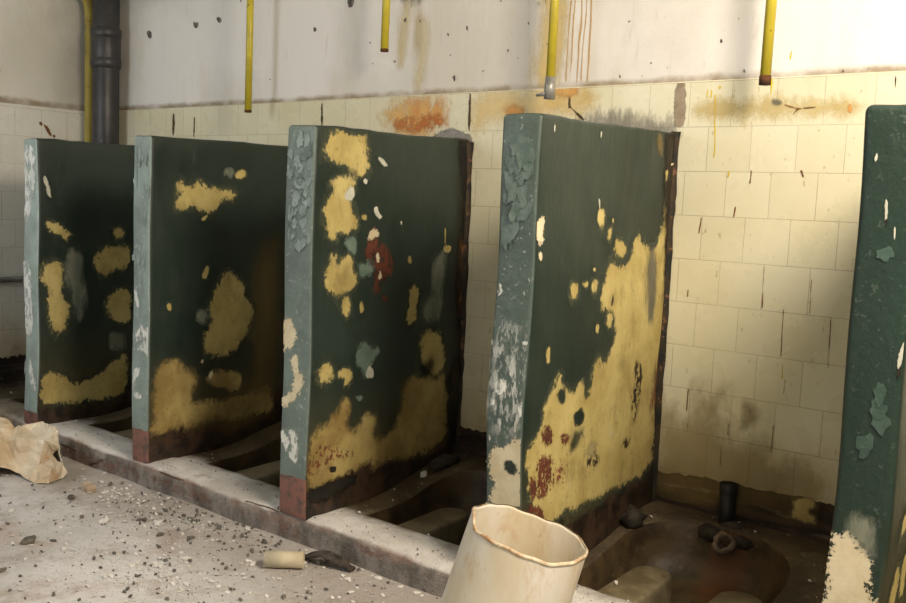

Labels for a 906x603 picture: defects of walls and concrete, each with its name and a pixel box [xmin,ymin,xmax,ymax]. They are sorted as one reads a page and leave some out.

rust [387,97,445,136]
rust [477,0,592,125]
damp [698,100,853,117]
peeling [24,144,51,224]
peeling [173,168,248,222]
peeling [285,128,388,321]
peeling [501,130,545,261]
peeling [876,200,896,262]
peeling [23,219,148,407]
peeling [149,228,452,489]
peeling [486,199,667,522]
peeling [822,517,906,603]